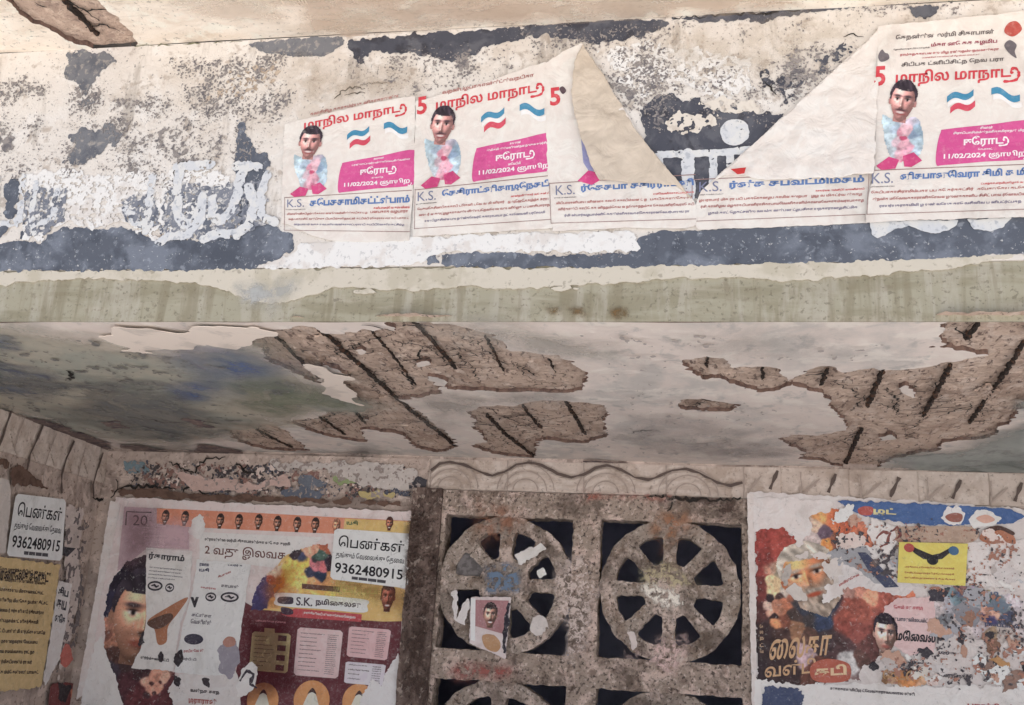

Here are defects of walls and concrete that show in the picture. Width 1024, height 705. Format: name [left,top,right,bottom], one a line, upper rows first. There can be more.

flaking render [0,0,1024,304]
spalling [0,311,1024,465]
flaking render [111,488,401,507]